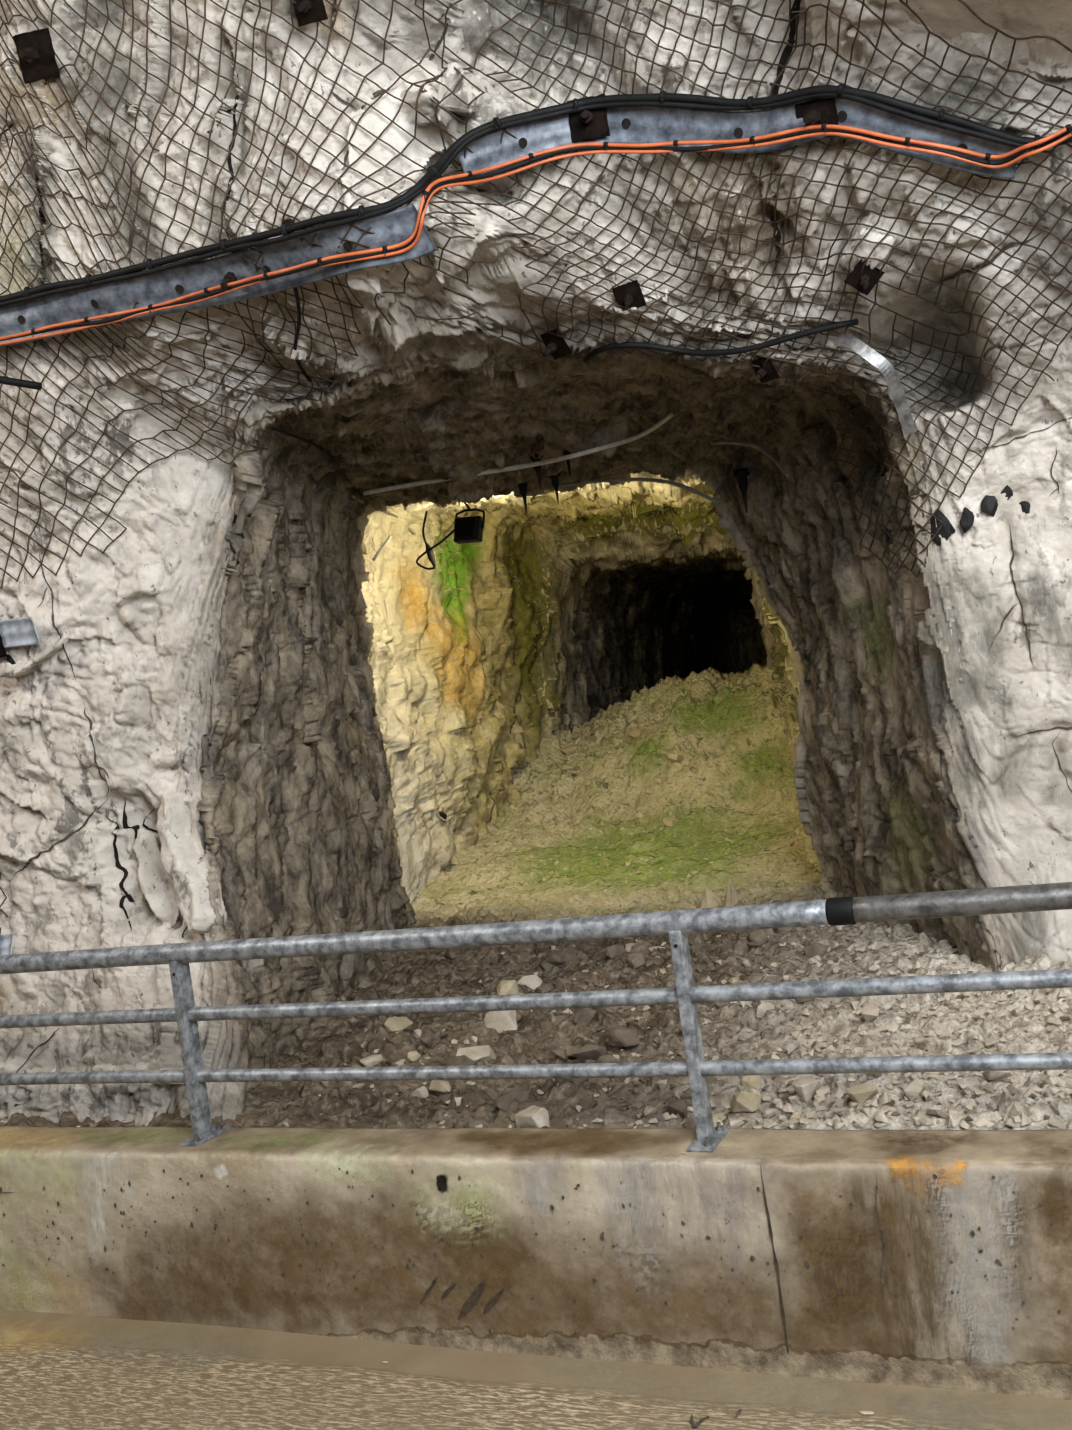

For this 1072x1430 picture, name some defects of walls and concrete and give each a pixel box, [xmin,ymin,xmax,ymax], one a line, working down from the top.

crack [969,417,1072,495]
crack [989,525,1034,667]
crack [11,552,158,930]
leakage [97,1205,770,1349]
leakage [788,1176,1072,1367]